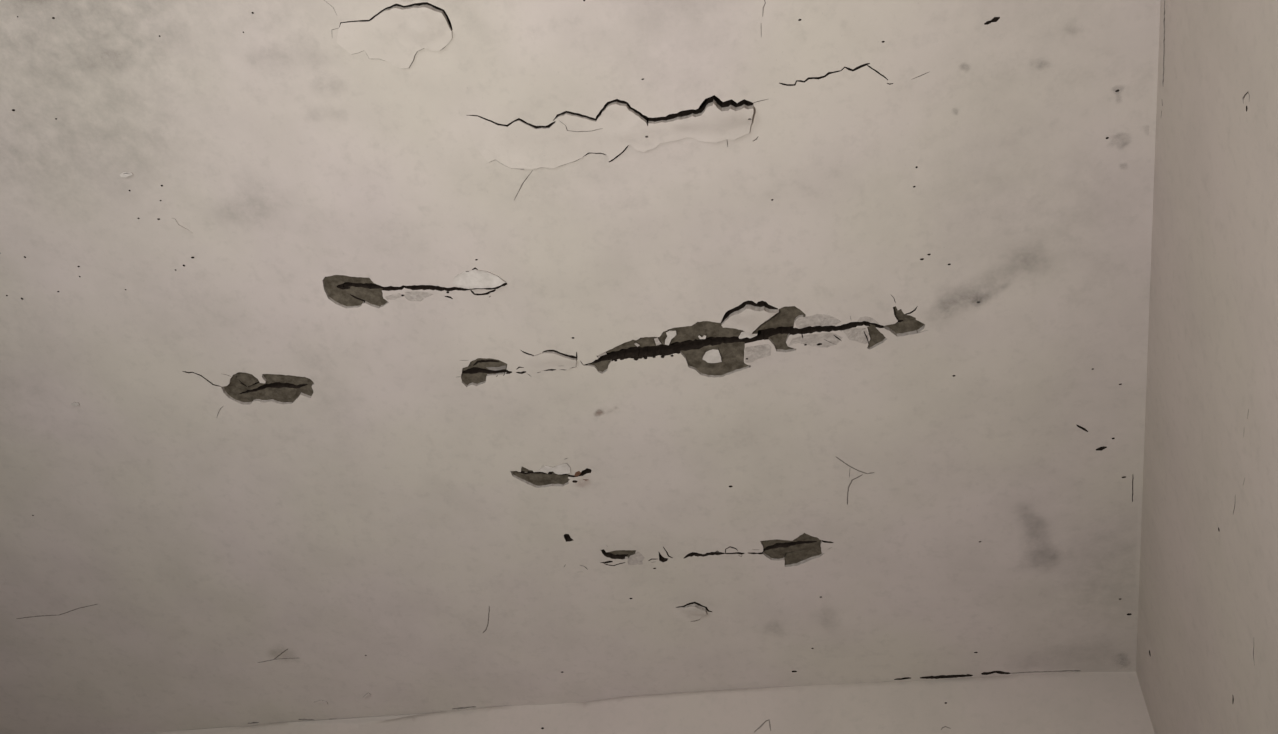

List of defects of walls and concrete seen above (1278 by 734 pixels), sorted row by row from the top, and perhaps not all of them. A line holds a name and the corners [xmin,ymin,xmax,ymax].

crack [779,63,929,86]
spalling [323,259,507,308]
spalling [461,295,927,387]
spalling [182,371,314,416]
spalling [511,458,592,488]
spalling [601,533,833,569]